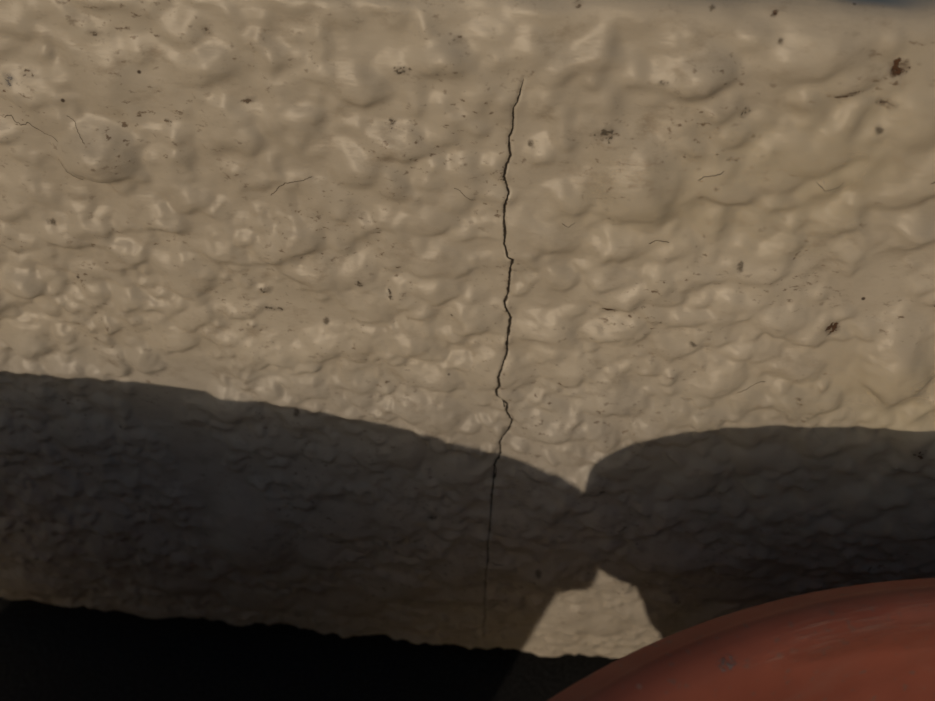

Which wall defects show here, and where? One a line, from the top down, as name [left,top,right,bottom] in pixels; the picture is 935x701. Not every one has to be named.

crack [483,79,524,638]